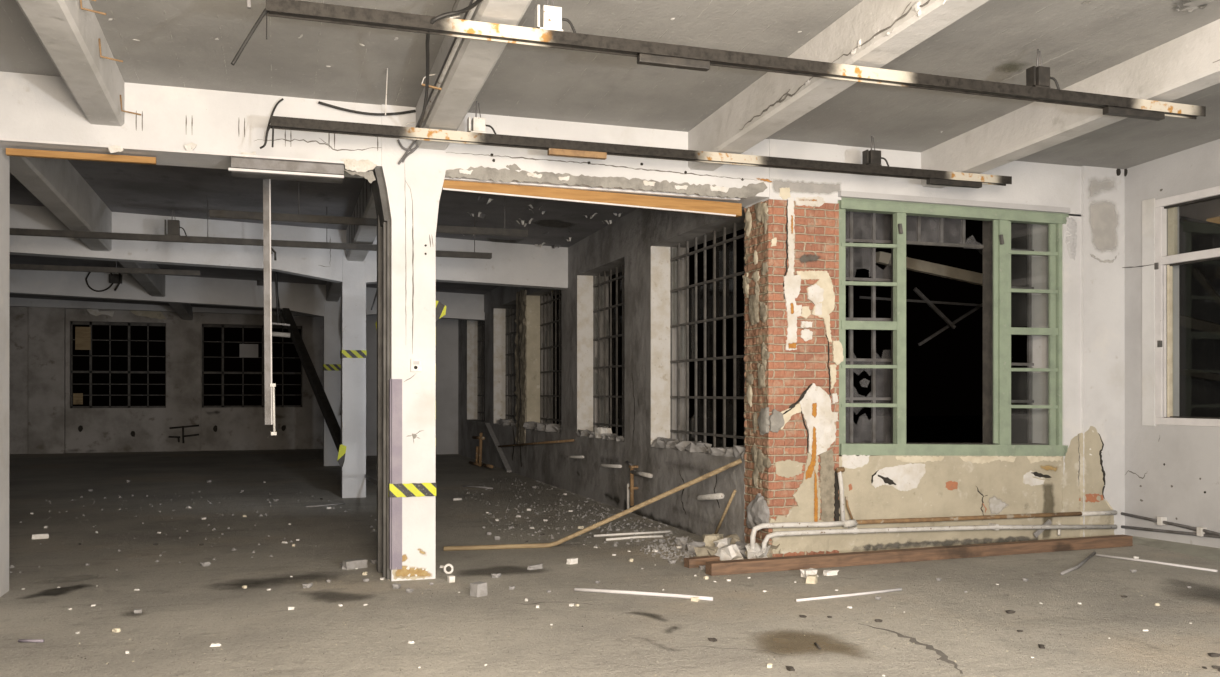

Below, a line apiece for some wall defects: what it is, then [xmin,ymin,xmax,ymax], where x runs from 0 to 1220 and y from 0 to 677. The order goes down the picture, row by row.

crack [741,0,946,130]
spalling [341,159,376,183]
spalling [445,164,767,218]
peeling [517,204,643,249]
spalling [1041,426,1115,539]
peeling [392,549,431,580]
leakage [764,633,853,653]
crack [858,623,963,674]